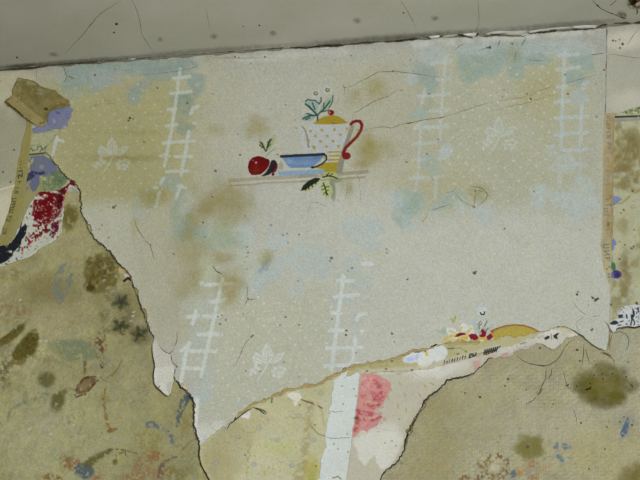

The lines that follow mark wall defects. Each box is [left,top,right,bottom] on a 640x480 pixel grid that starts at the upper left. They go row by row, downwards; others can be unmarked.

peeling [0,187,339,480]
peeling [381,326,640,480]
water stain [567,373,627,403]